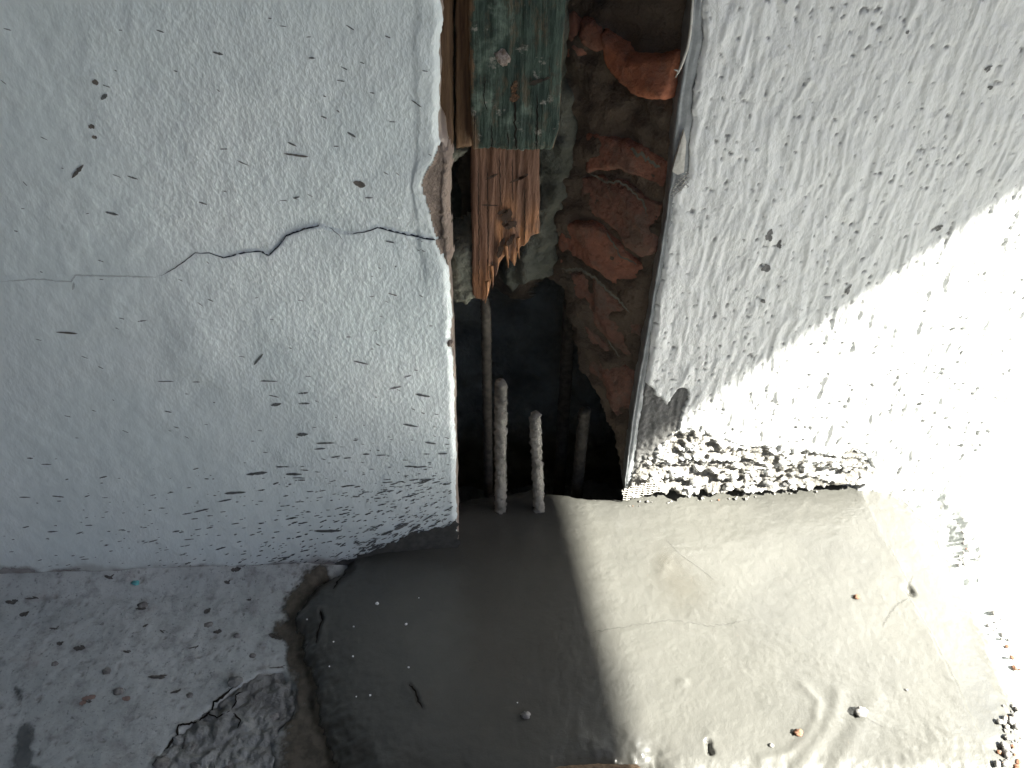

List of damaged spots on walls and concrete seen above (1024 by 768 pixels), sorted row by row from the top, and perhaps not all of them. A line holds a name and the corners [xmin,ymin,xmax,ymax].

crack [156,223,435,277]
flaking render [421,138,455,265]
spalling [480,298,508,514]
spalling [529,290,591,513]
flaking render [621,383,877,498]
spalling [152,673,296,768]